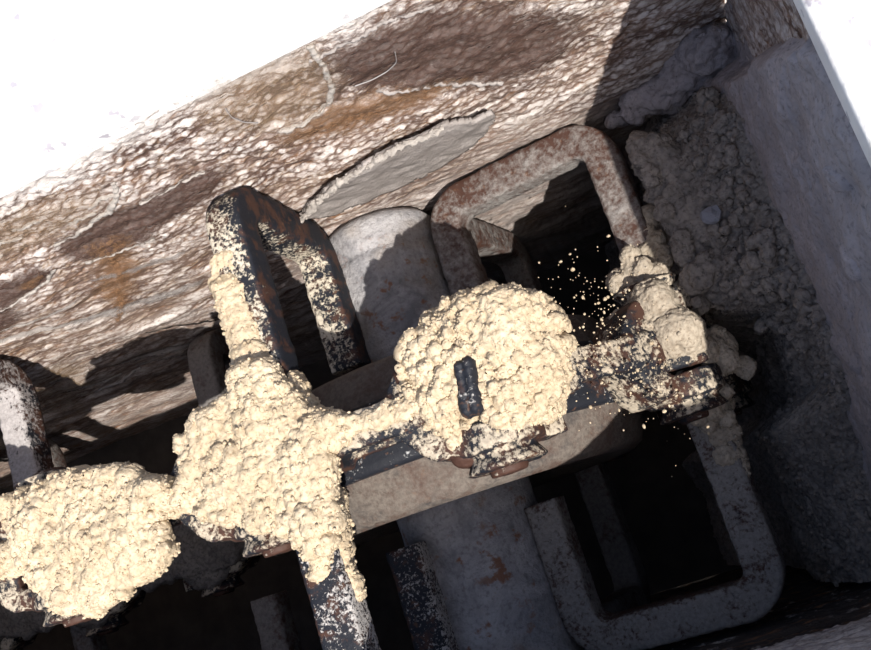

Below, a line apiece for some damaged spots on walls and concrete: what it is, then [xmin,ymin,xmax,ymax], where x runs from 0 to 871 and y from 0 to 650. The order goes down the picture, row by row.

peeling [0,220,43,258]
spalling [52,166,236,264]
spalling [0,269,57,337]
spalling [454,356,484,419]
spalling [451,457,474,469]